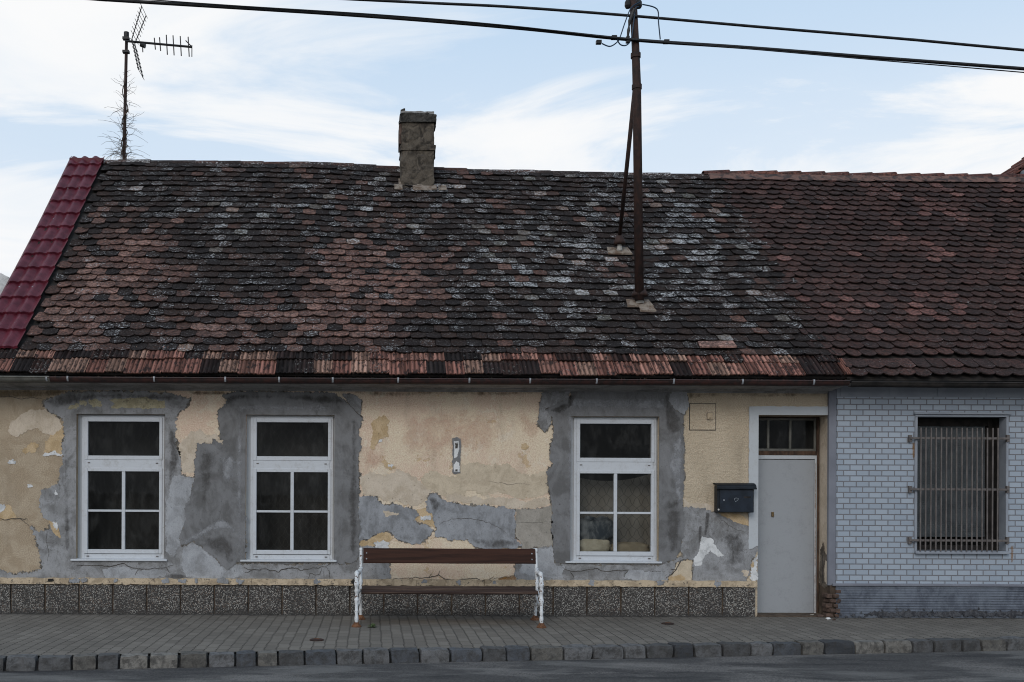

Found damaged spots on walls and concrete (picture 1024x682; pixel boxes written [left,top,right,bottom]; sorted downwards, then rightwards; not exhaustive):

peeling [0,390,758,587]